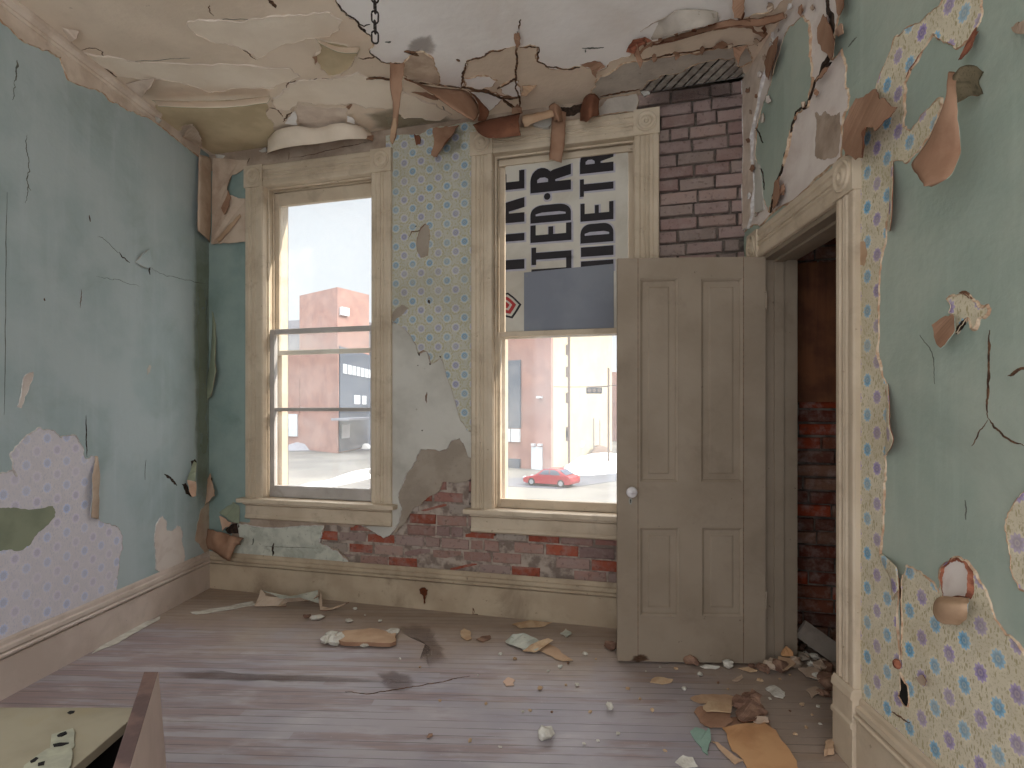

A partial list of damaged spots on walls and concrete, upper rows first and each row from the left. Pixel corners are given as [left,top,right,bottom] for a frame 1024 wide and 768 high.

peeling [0,0,850,258]
peeling [0,427,123,640]
peeling [154,516,185,572]
spalling [233,305,617,583]
peeling [860,0,1024,768]
crack [972,330,1024,446]
crack [353,676,469,694]